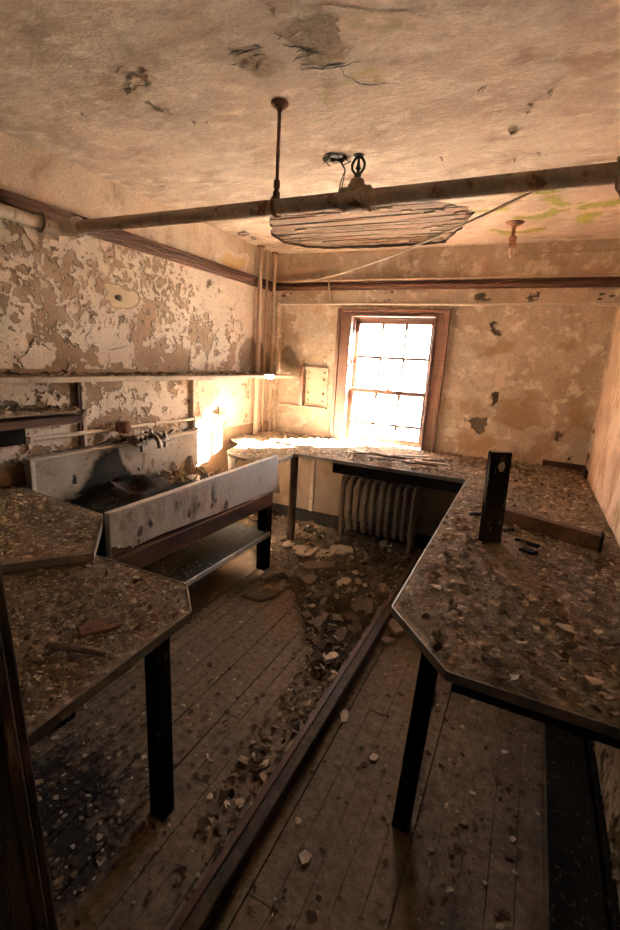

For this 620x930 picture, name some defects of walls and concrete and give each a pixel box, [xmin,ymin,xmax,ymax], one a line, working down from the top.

peeling [114,66,172,117]
flaking render [215,2,372,87]
crack [254,33,400,86]
peeling [0,212,620,725]